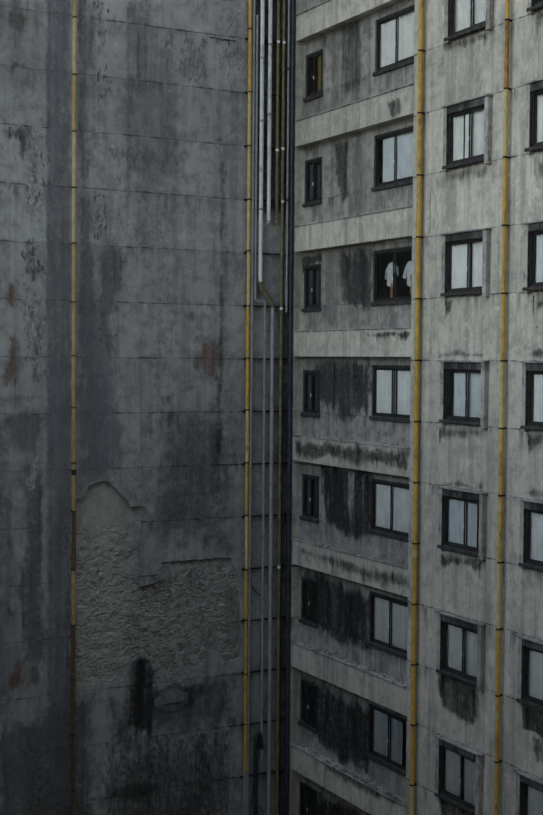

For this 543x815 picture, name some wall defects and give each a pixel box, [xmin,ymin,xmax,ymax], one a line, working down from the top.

flaking render [60,479,241,686]
damp [279,356,409,718]
damp [119,658,226,740]
damp [301,677,399,802]